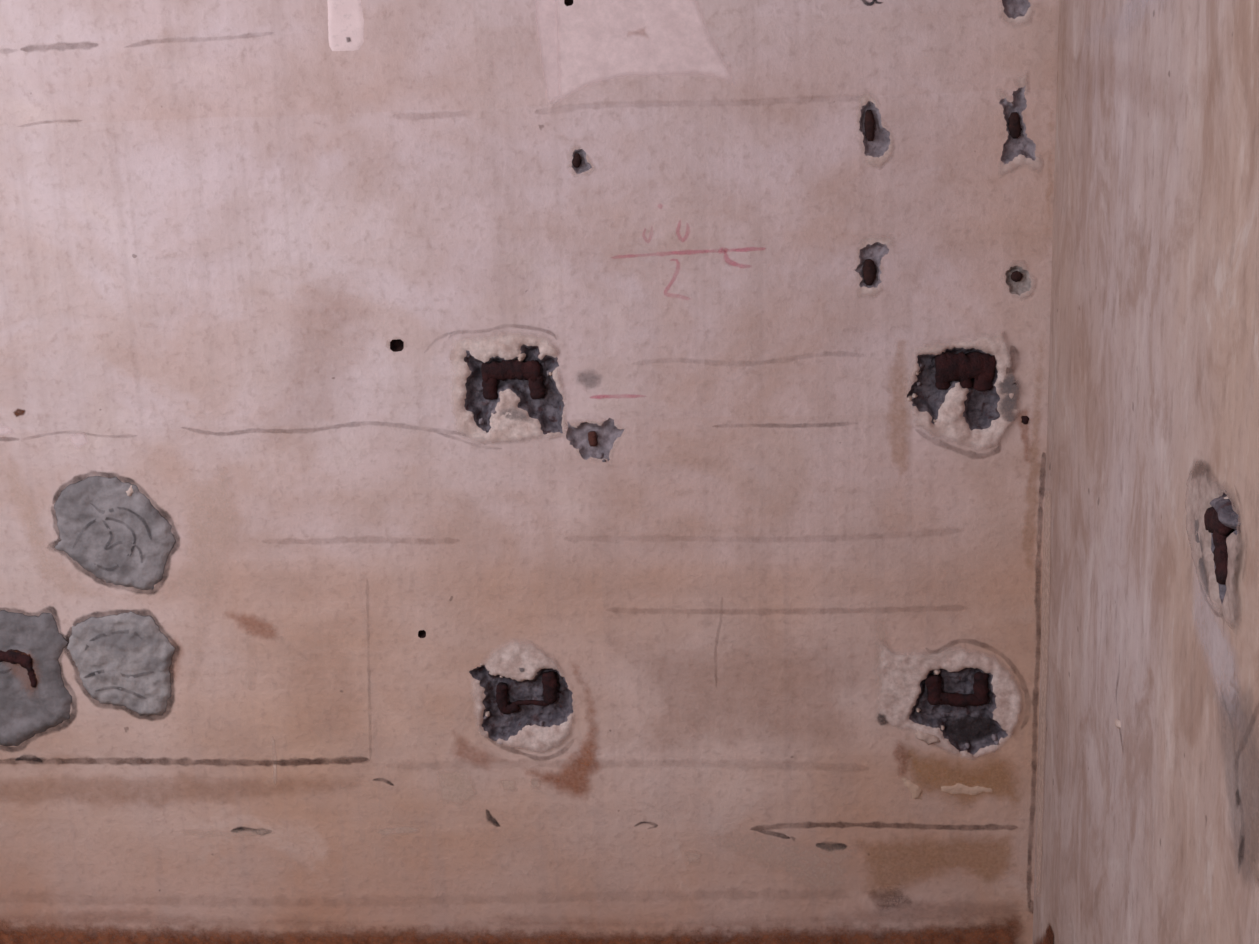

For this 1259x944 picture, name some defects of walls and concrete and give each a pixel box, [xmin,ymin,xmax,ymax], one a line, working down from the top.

spalling [1002,0,1032,24]
spalling [858,94,893,167]
spalling [998,75,1043,174]
spalling [855,238,889,295]
spalling [450,333,624,462]
spalling [907,333,1029,447]
spalling [1185,463,1241,626]
spalling [469,642,574,752]
spalling [877,646,1020,758]
spalling [940,783,993,796]